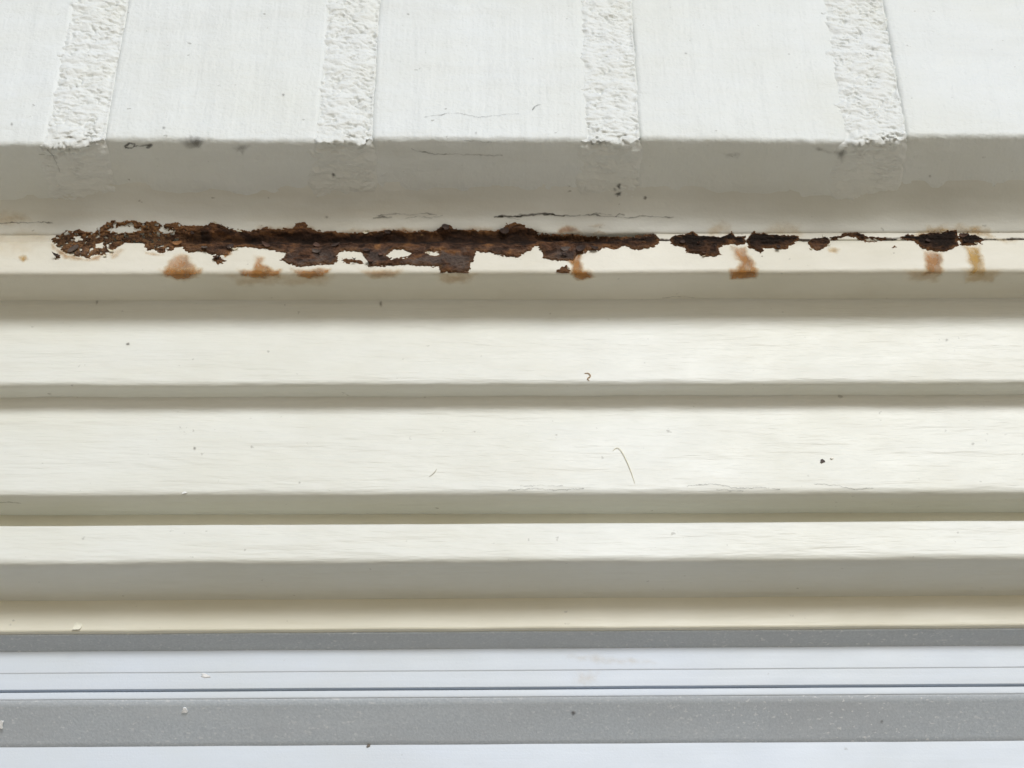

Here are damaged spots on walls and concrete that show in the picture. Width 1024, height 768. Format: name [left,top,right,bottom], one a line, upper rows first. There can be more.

rust [165,259,200,279]
rust [242,259,279,278]
rust [298,269,329,278]
rust [569,255,592,280]
rust [731,250,756,279]
rust [926,254,941,274]
rust [969,248,981,273]